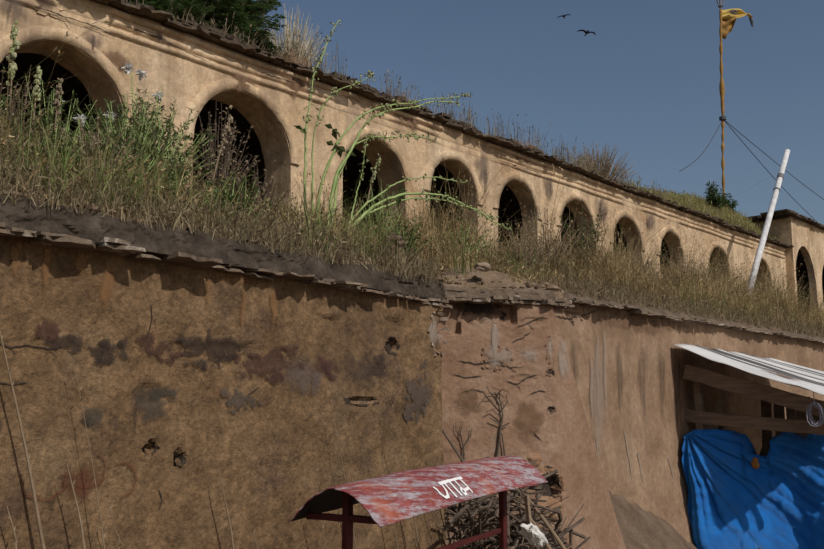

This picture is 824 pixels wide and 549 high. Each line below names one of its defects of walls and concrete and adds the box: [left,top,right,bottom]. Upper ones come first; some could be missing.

water stain [610,311,680,334]